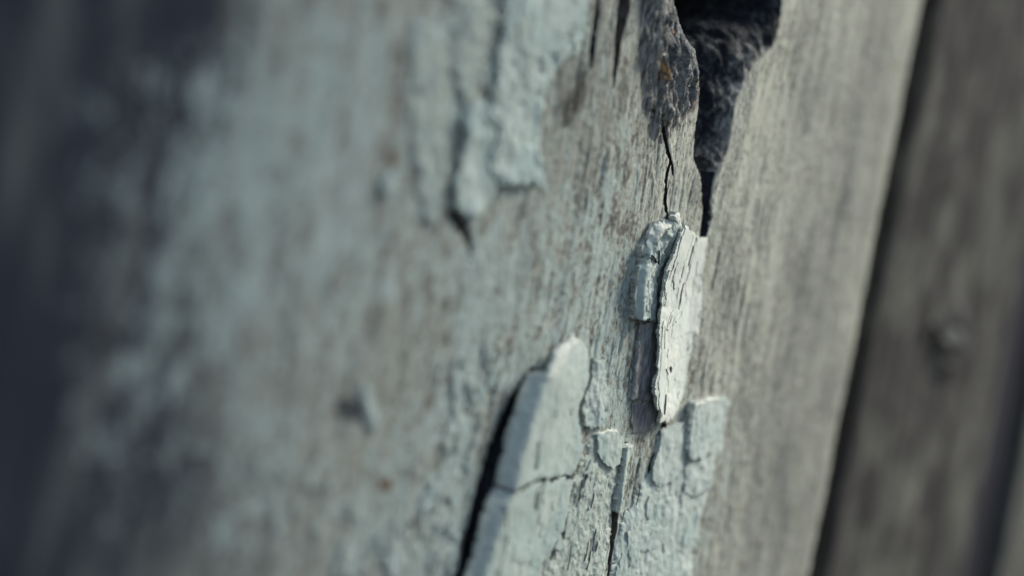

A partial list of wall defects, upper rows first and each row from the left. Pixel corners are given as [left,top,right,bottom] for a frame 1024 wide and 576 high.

crack [662,120,715,237]
crack [454,368,534,576]
peeling [319,211,730,576]